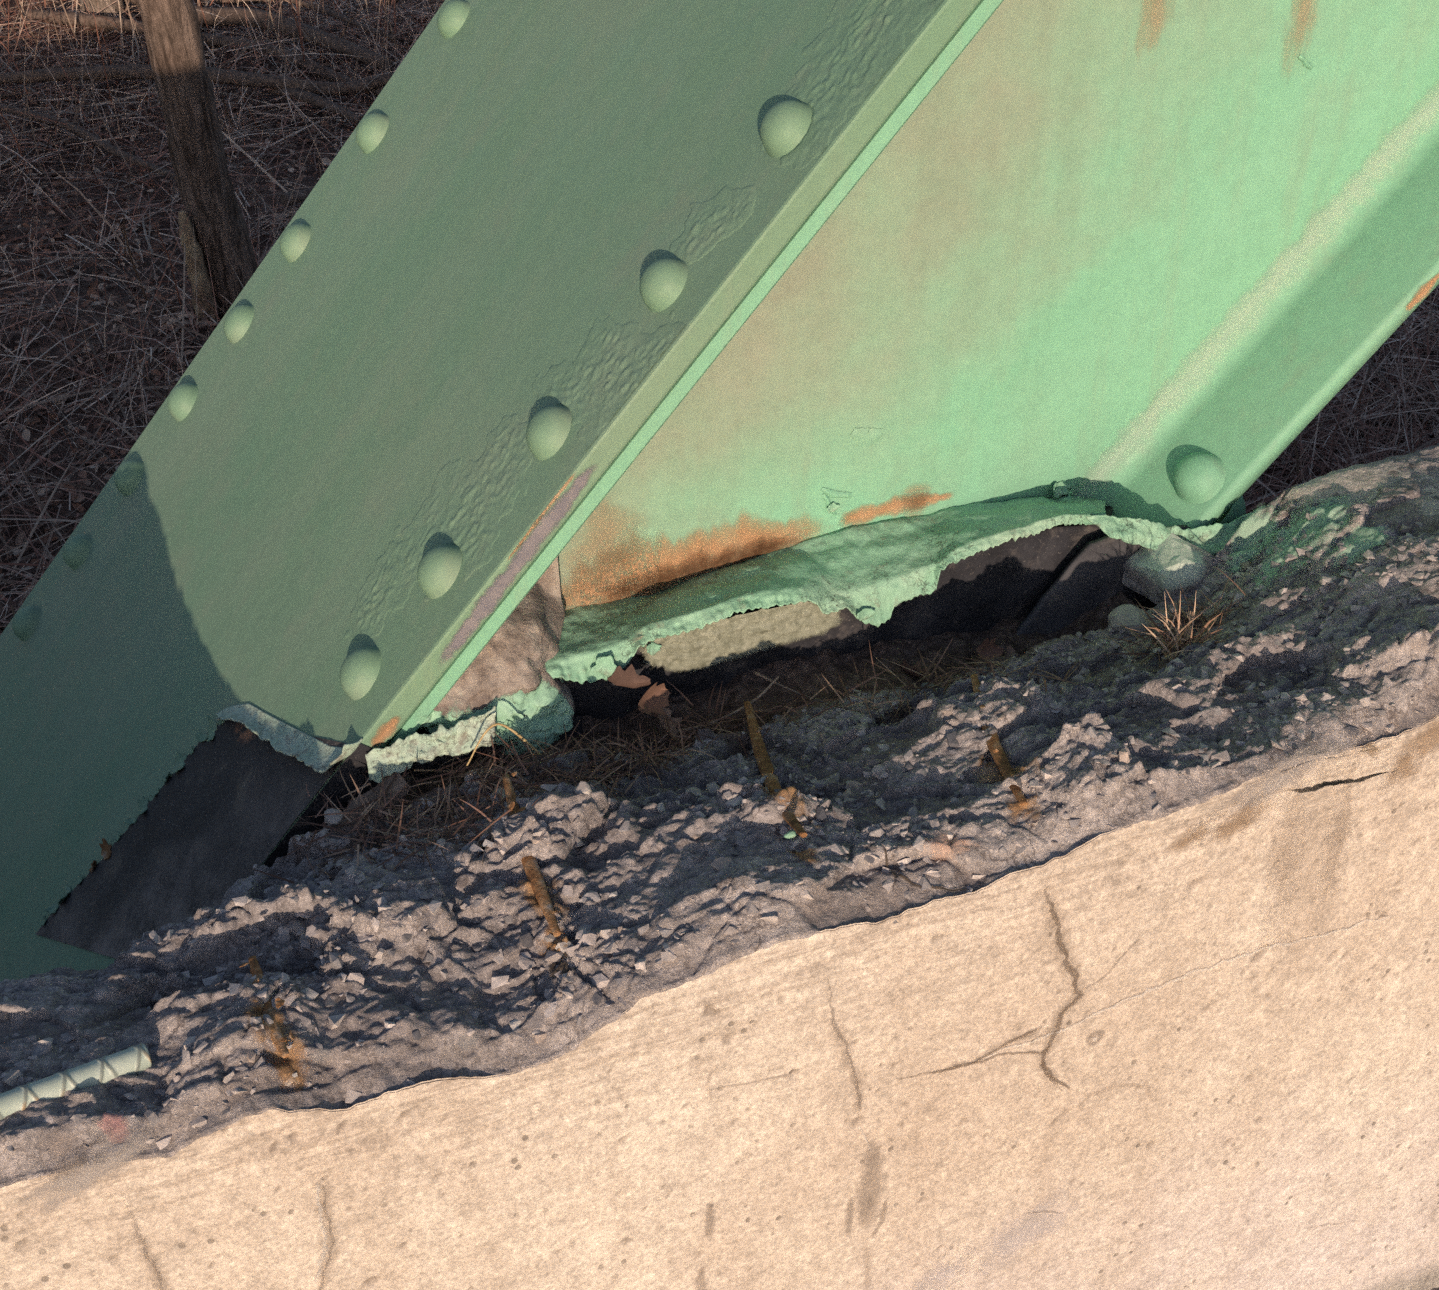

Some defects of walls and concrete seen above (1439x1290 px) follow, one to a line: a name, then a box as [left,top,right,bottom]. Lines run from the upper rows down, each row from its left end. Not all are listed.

rust [562,520,810,606]
rust [844,494,949,523]
spalling [0,443,1439,1188]
crack [910,900,1082,1089]